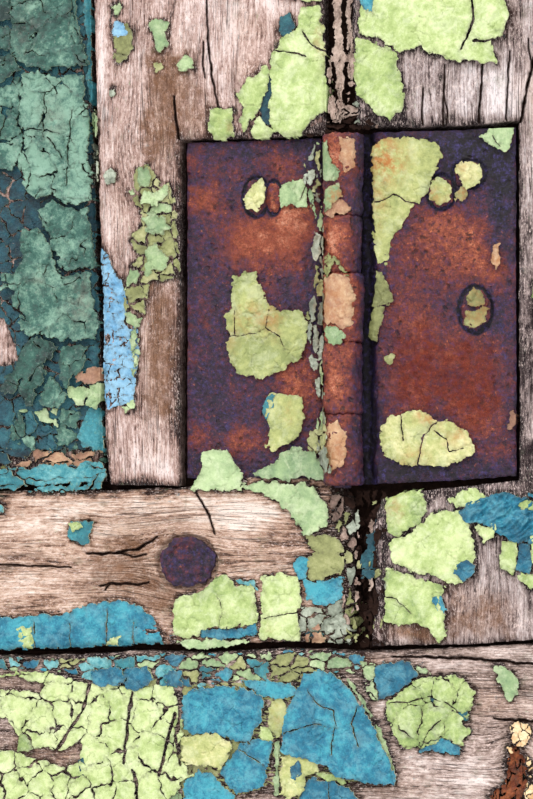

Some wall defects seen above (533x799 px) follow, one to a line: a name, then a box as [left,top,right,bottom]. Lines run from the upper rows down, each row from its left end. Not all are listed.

peeling [0,0,181,493]
peeling [208,0,514,400]
corrosion [95,538,157,589]
crack [195,490,215,534]
peeling [0,392,533,799]